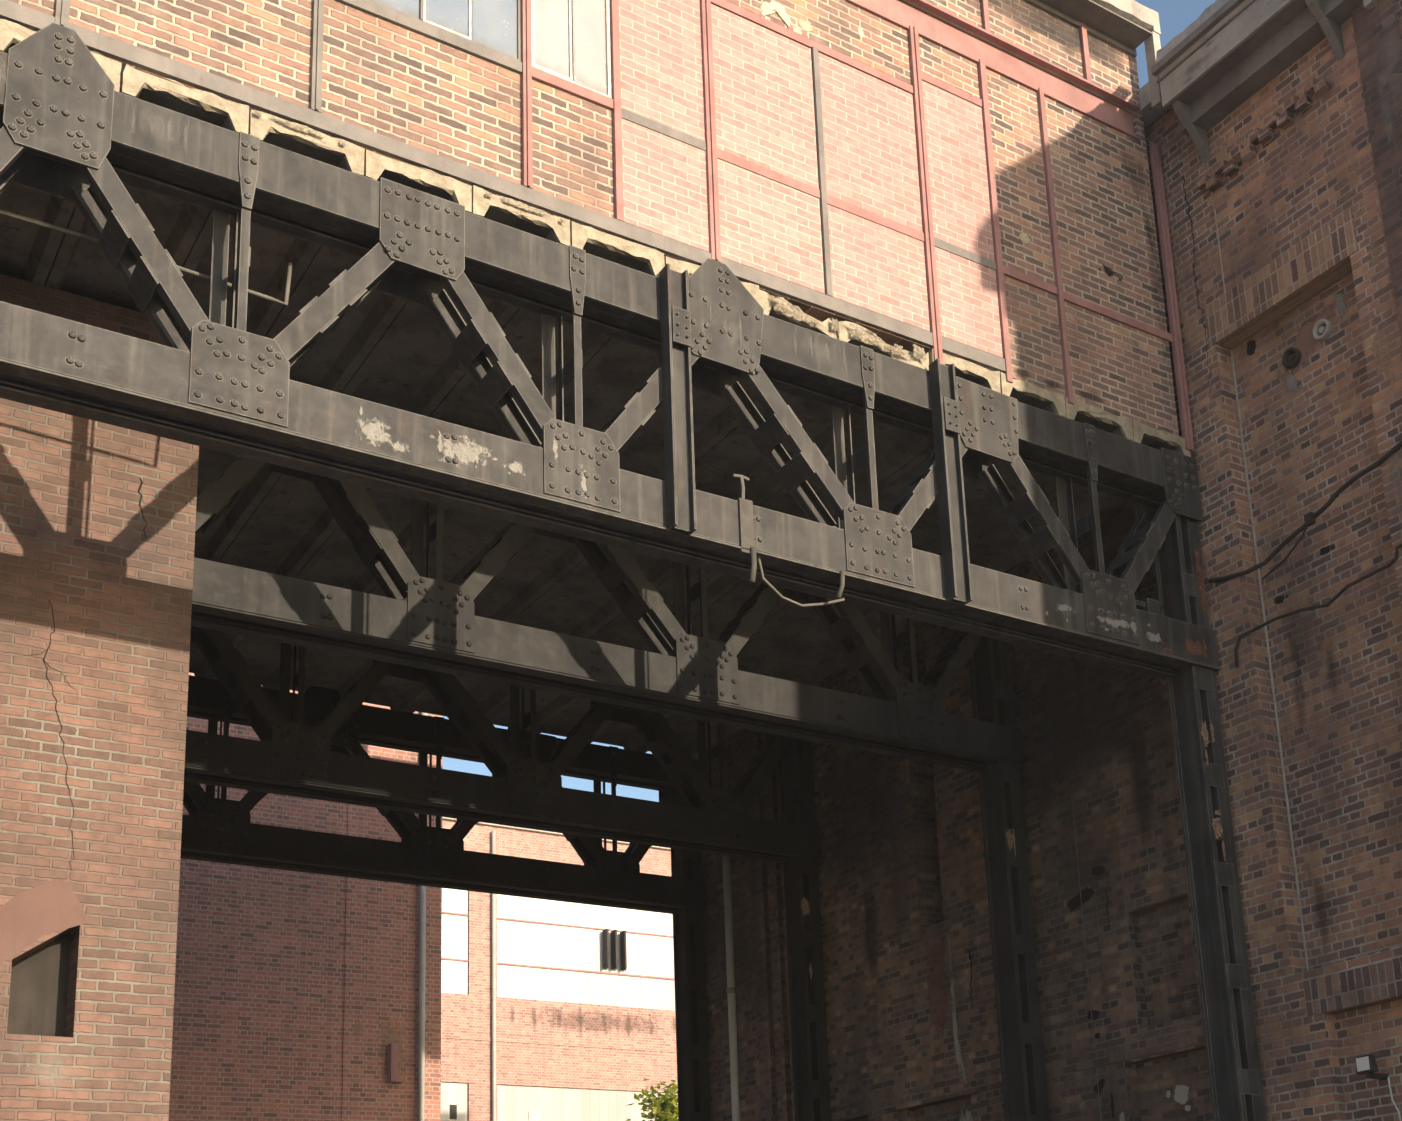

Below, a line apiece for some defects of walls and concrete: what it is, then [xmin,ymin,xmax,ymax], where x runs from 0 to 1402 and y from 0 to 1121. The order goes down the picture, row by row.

spalling [772,295,926,361]
crack [26,599,78,870]
flaking render [1166,1084,1191,1111]